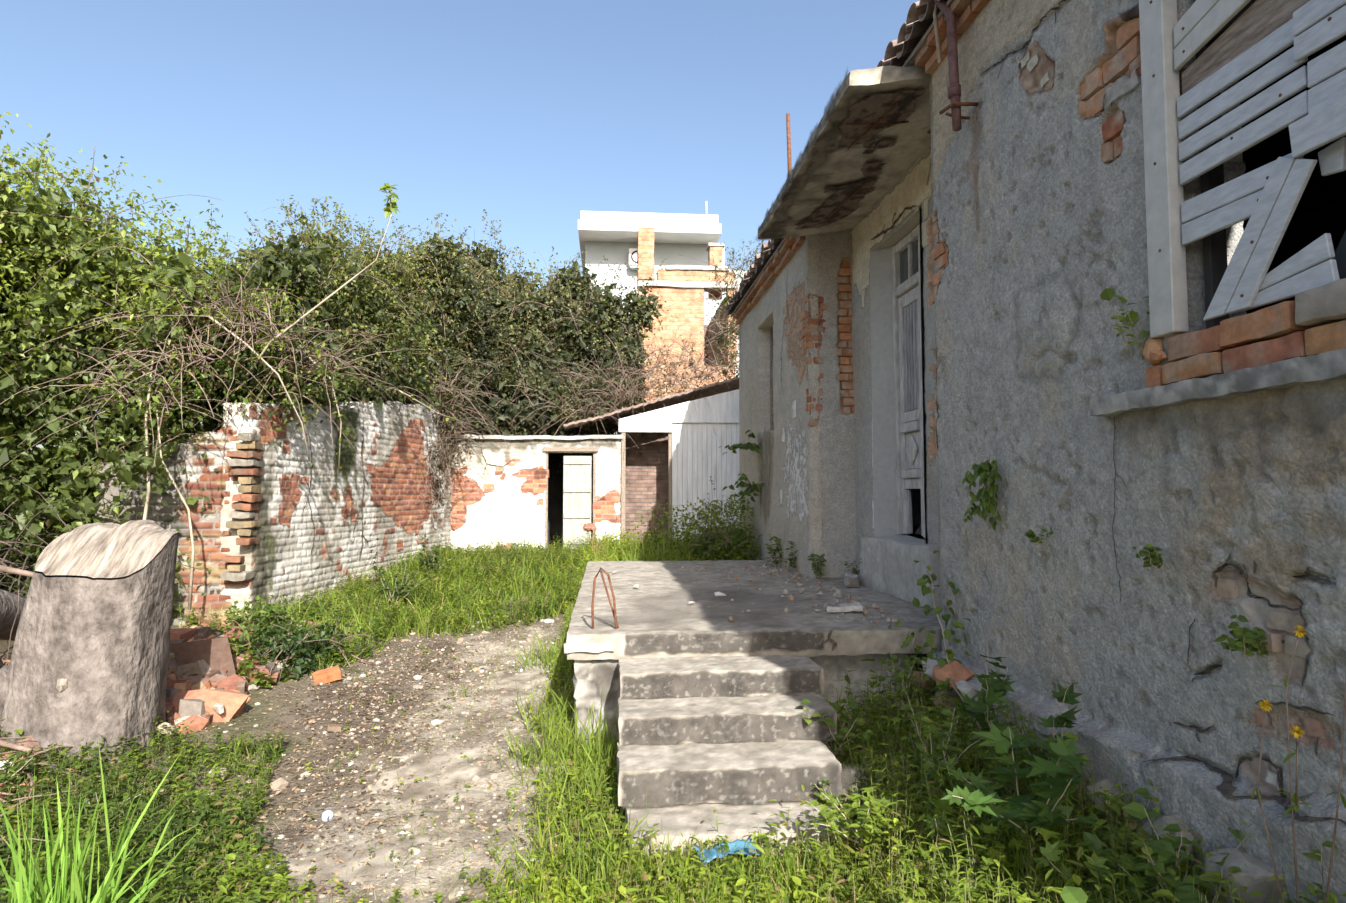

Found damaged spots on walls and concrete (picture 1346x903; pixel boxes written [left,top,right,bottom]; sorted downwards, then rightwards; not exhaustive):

spalling [1019,41,1055,95]
flaking render [1078,3,1141,163]
peeling [780,89,949,522]
flaking render [331,485,358,525]
flaking render [366,418,549,552]
flaking render [584,489,621,530]
crack [1112,416,1126,600]
spalling [1212,570,1313,685]
spalling [1240,755,1284,796]